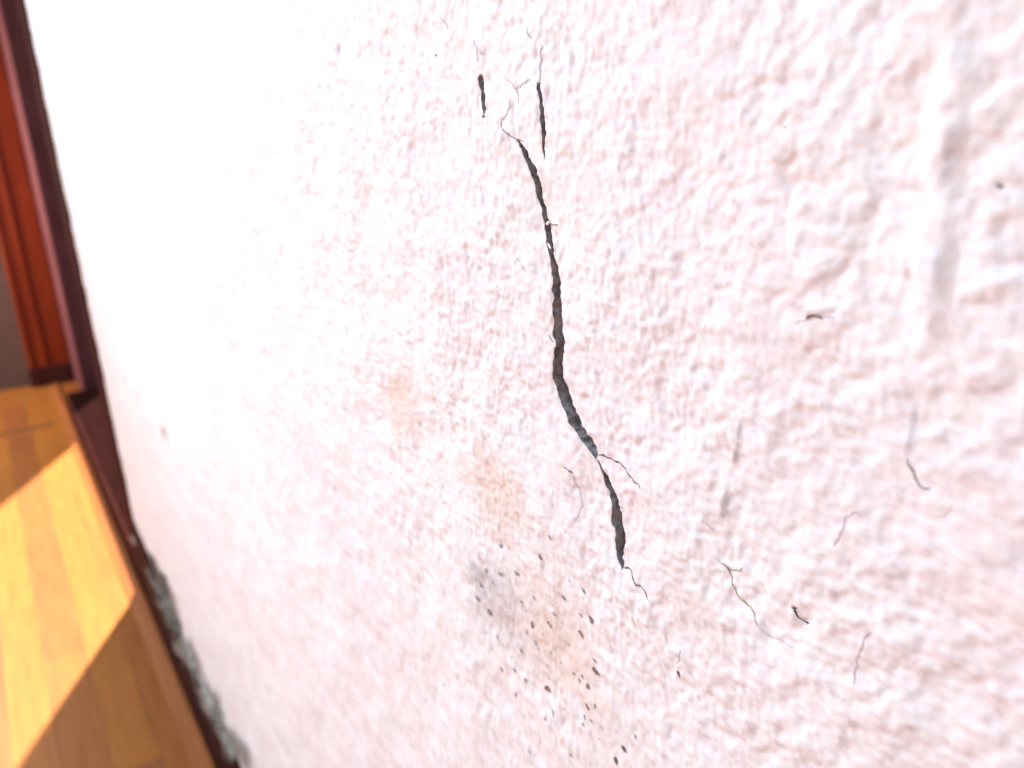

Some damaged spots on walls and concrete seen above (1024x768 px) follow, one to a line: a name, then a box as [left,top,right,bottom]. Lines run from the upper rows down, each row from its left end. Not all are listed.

crack [473,24,648,599]
crack [717,559,791,647]